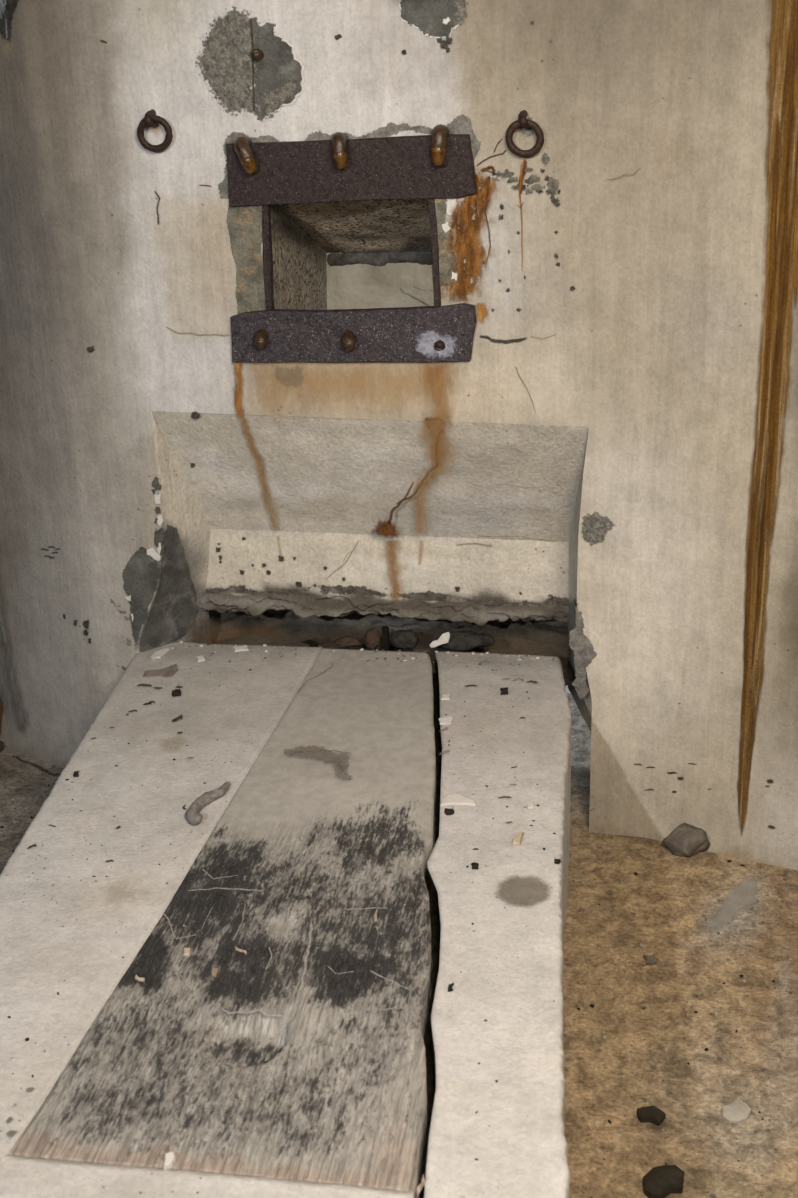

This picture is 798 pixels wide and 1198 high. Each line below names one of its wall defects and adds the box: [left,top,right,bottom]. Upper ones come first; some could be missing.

peeling [0,0,18,41]
spalling [195,7,305,122]
spalling [398,0,467,53]
rust [446,166,495,322]
rust [235,362,273,521]
rust [372,369,446,597]
spalling [581,512,615,546]
spalling [110,477,597,699]
leakage [284,745,351,780]
crack [419,656,442,1198]
leakage [499,876,548,906]